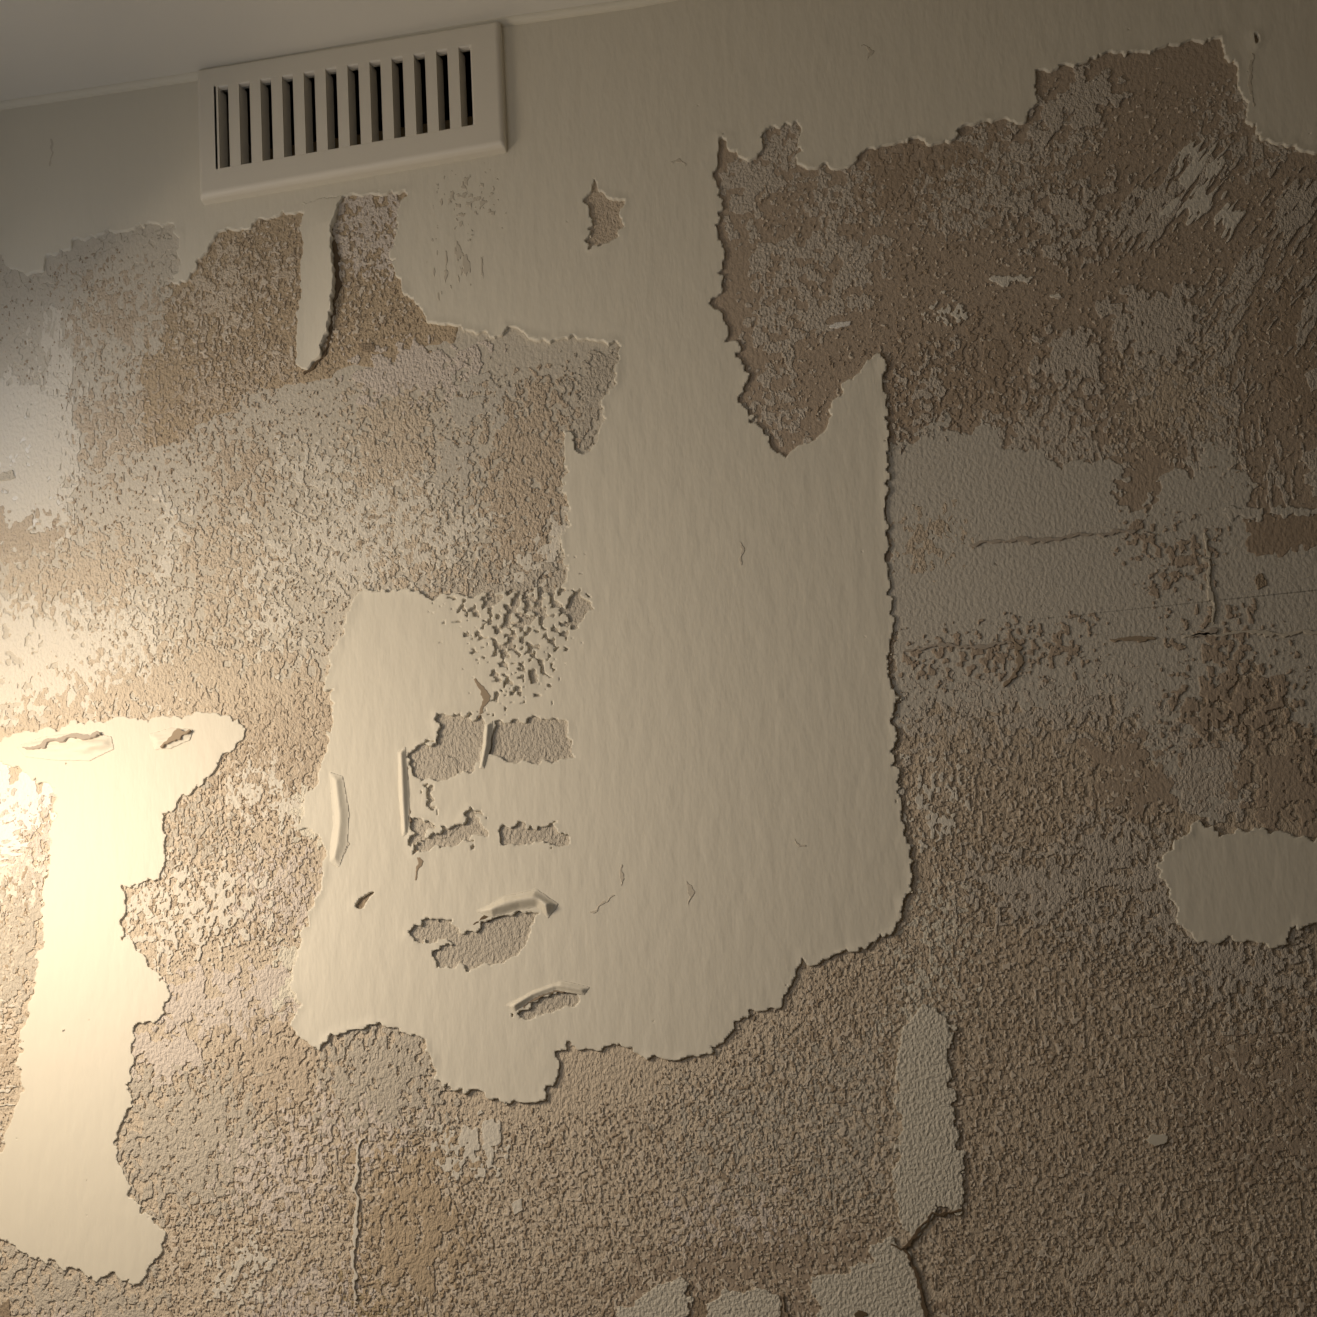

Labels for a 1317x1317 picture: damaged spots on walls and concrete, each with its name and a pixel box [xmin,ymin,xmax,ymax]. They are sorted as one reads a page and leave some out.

peeling [0,192,620,731]
peeling [584,181,625,249]
peeling [710,39,1317,609]
peeling [0,598,1317,1317]
crack [891,1209,962,1317]